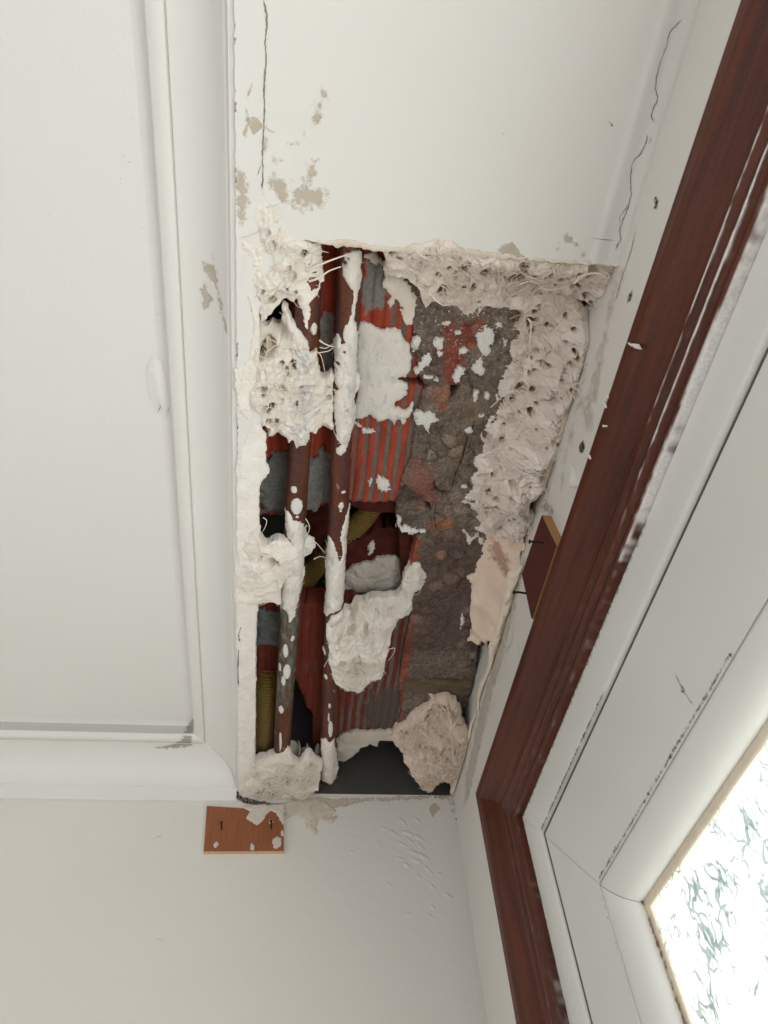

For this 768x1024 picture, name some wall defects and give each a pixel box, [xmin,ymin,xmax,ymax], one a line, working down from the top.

crack [257,3,273,188]
flaking render [315,239,608,267]
crack [615,19,682,301]
flaking render [233,295,270,555]
flaking render [235,600,259,796]